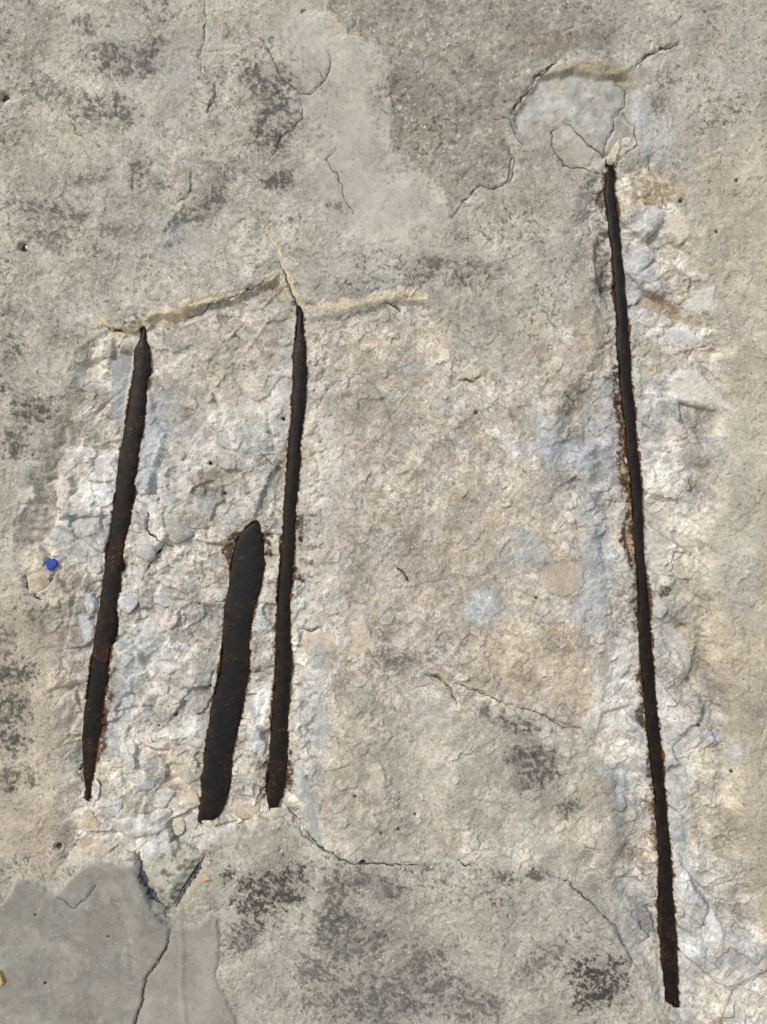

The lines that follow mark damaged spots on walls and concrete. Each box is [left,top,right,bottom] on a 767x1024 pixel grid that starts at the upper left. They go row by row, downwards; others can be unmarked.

crack [452,61,558,218]
crack [550,44,679,173]
crack [188,266,297,318]
corrosion [76,423,146,798]
corrosion [214,383,306,820]
spalling [9,168,665,995]
corrosion [592,159,681,1008]
spalling [613,140,767,1024]
crack [425,674,576,728]
crack [282,802,430,868]
crack [546,872,633,961]